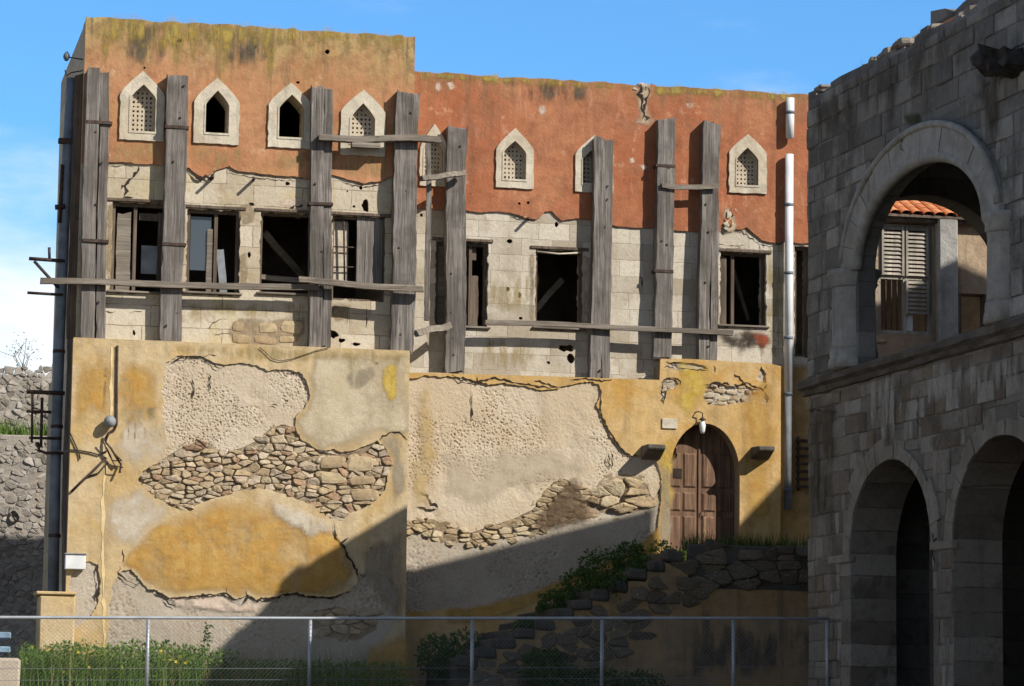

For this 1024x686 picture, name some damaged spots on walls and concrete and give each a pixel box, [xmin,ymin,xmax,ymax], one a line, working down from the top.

damp [130,28,154,61]
damp [220,37,274,70]
crack [98,162,140,198]
flaking render [659,362,707,403]
flaking render [703,368,768,406]
flaking render [69,356,662,686]
crack [95,525,366,607]